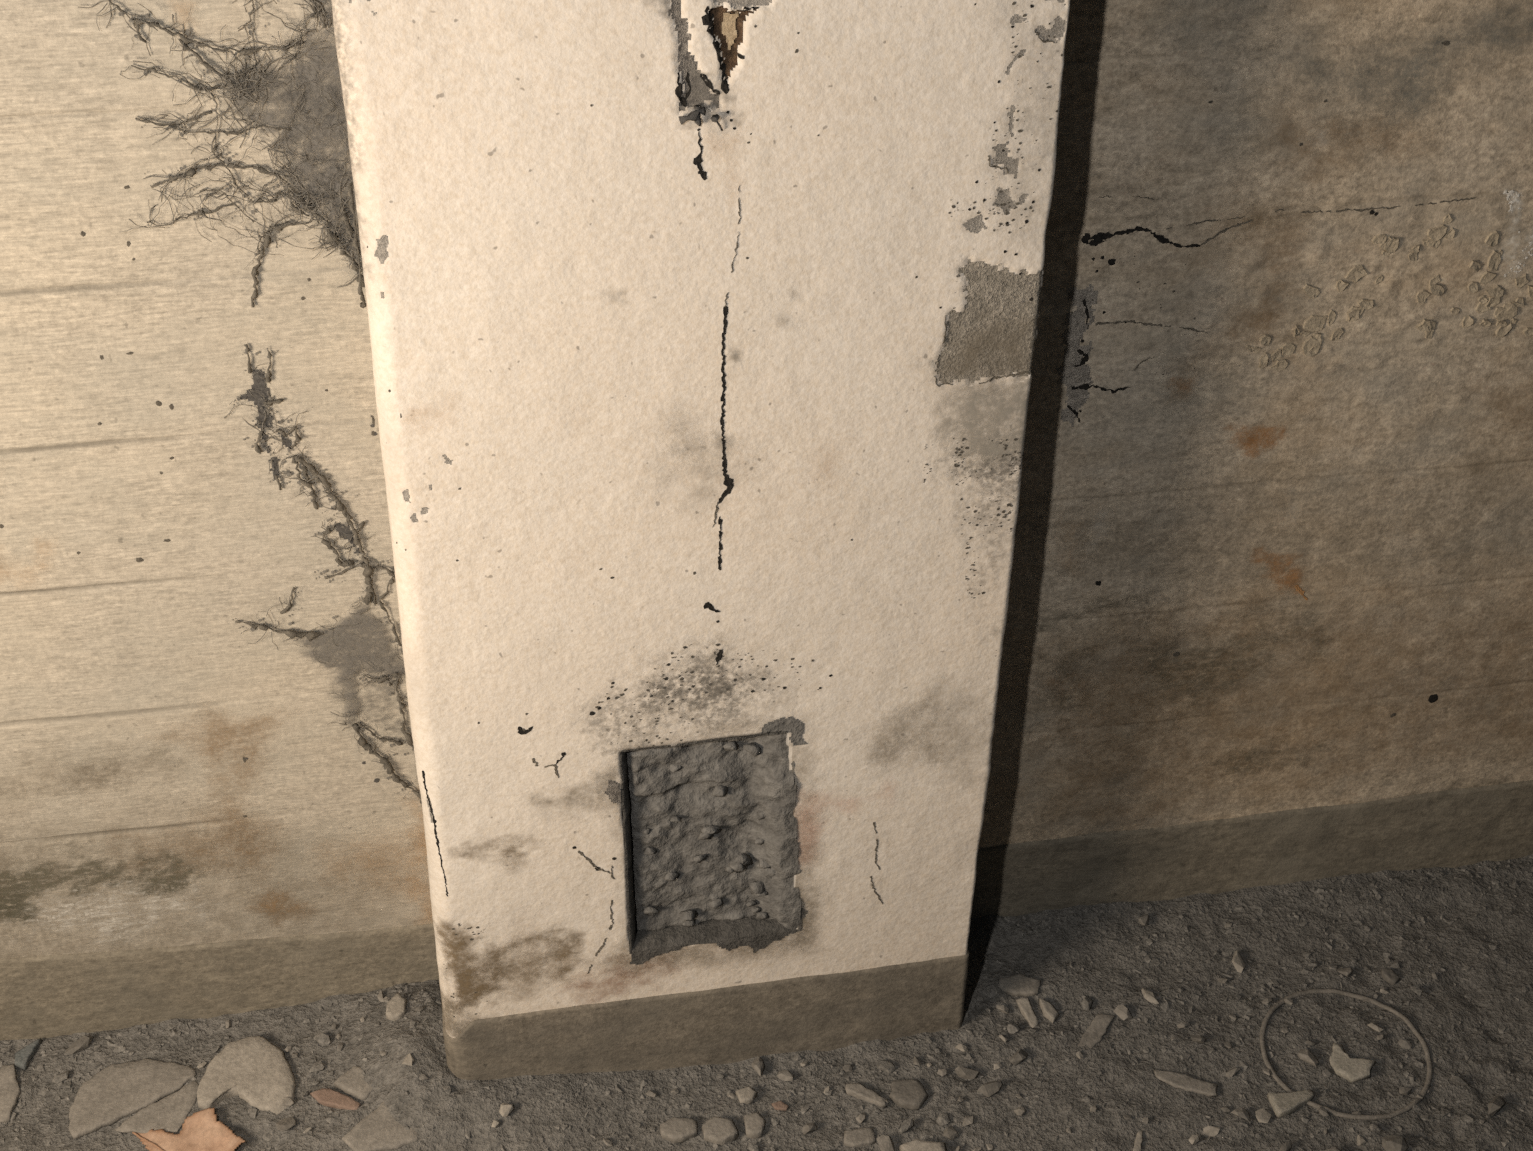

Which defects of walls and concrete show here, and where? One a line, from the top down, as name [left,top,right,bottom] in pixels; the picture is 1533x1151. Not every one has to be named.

spalling [668,0,772,180]
crack [712,188,740,570]
peeling [934,0,1067,599]
flaking render [1057,284,1098,427]
crack [1067,196,1475,423]
spalling [589,644,833,750]
leakage [0,854,199,938]
leakage [439,923,580,1036]
spalling [629,947,682,965]
spalling [717,908,807,953]